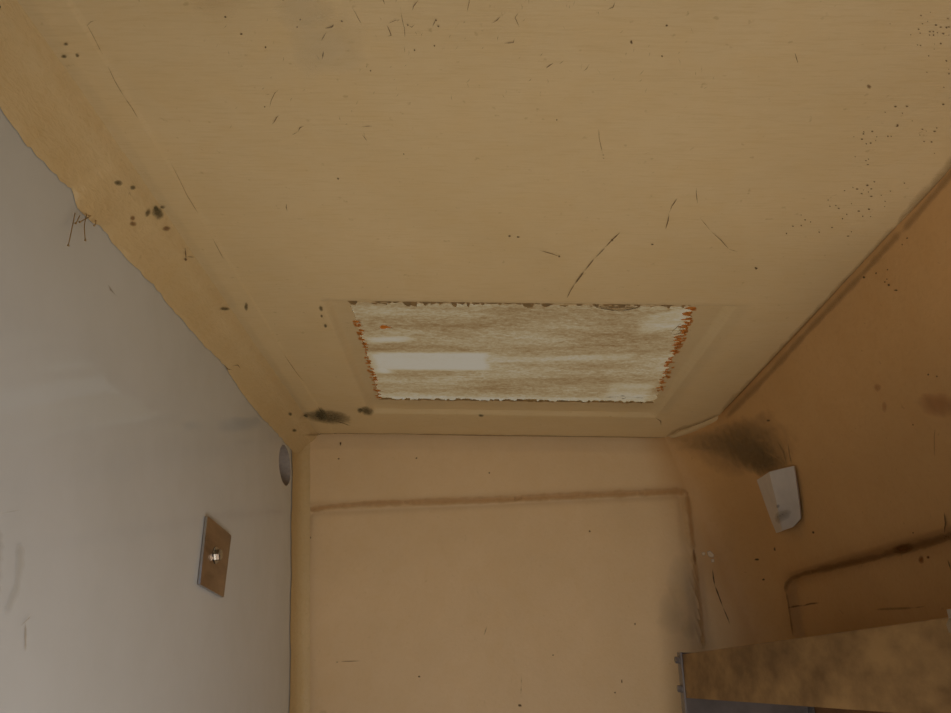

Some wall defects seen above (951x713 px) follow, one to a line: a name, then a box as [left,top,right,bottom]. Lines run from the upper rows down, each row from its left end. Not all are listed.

water stain [304,410,347,425]